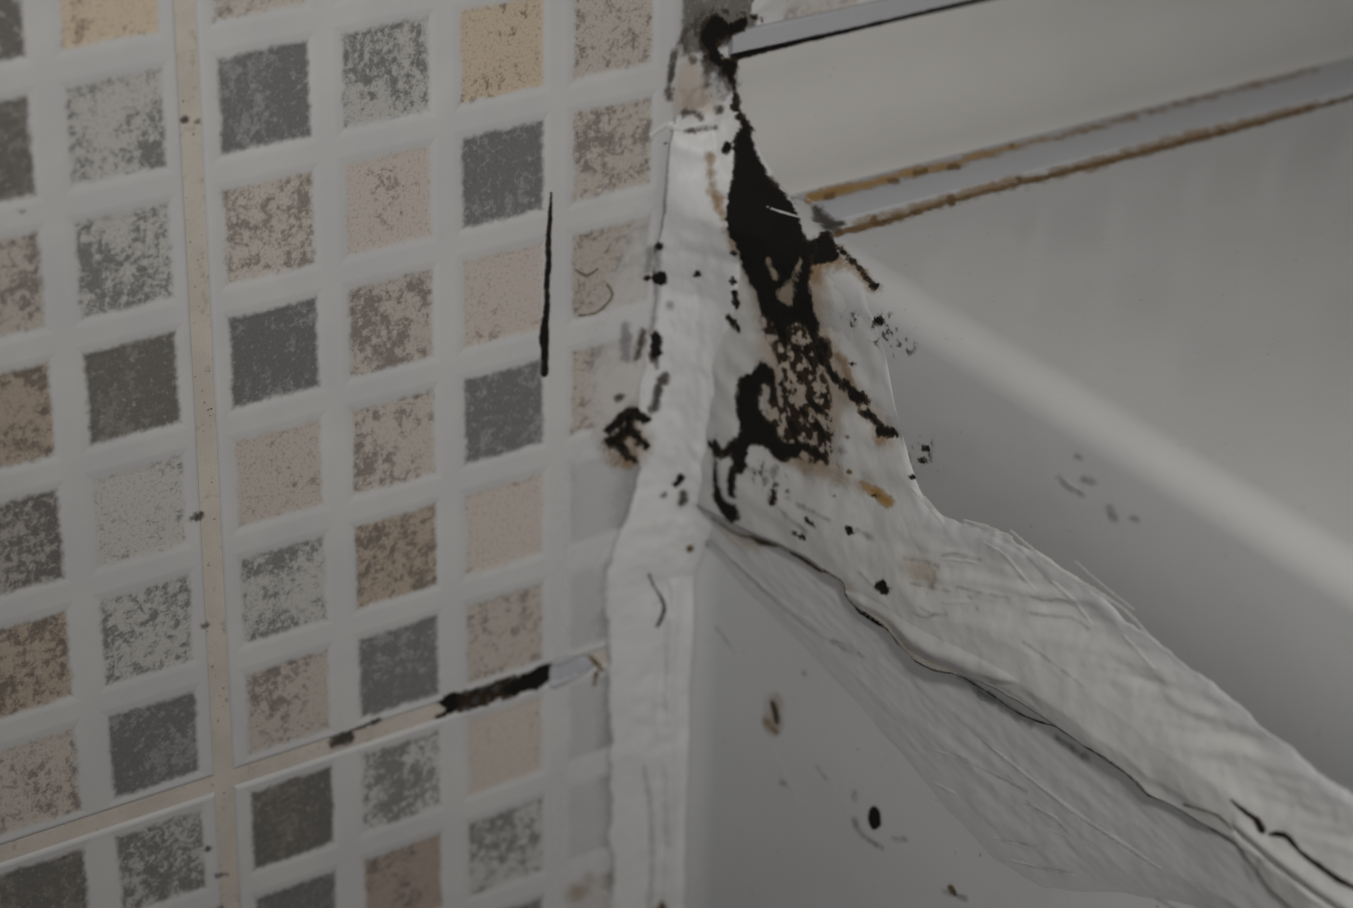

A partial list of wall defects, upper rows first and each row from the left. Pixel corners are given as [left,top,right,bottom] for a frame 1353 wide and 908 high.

crack [539,192,614,377]
water stain [644,271,667,285]
water stain [661,0,983,524]
water stain [602,329,669,467]
peeling [836,584,1019,685]
crack [711,517,1353,889]
spalling [868,806,881,830]